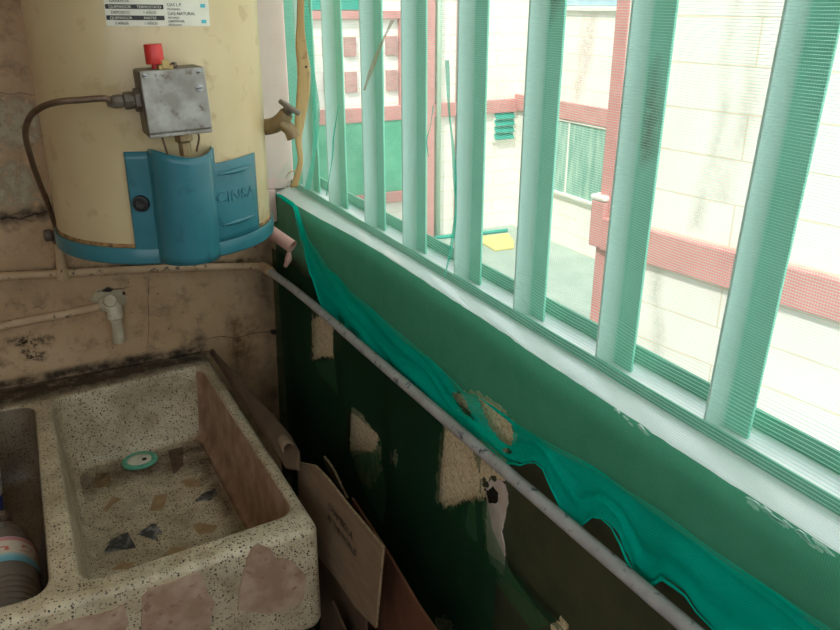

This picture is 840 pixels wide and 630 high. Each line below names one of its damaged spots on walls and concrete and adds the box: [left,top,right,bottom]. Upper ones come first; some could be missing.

crack [0,208,48,222]
flaking render [311,312,334,362]
flaking render [349,407,381,489]
flaking render [447,390,518,461]
flaking render [435,426,509,574]